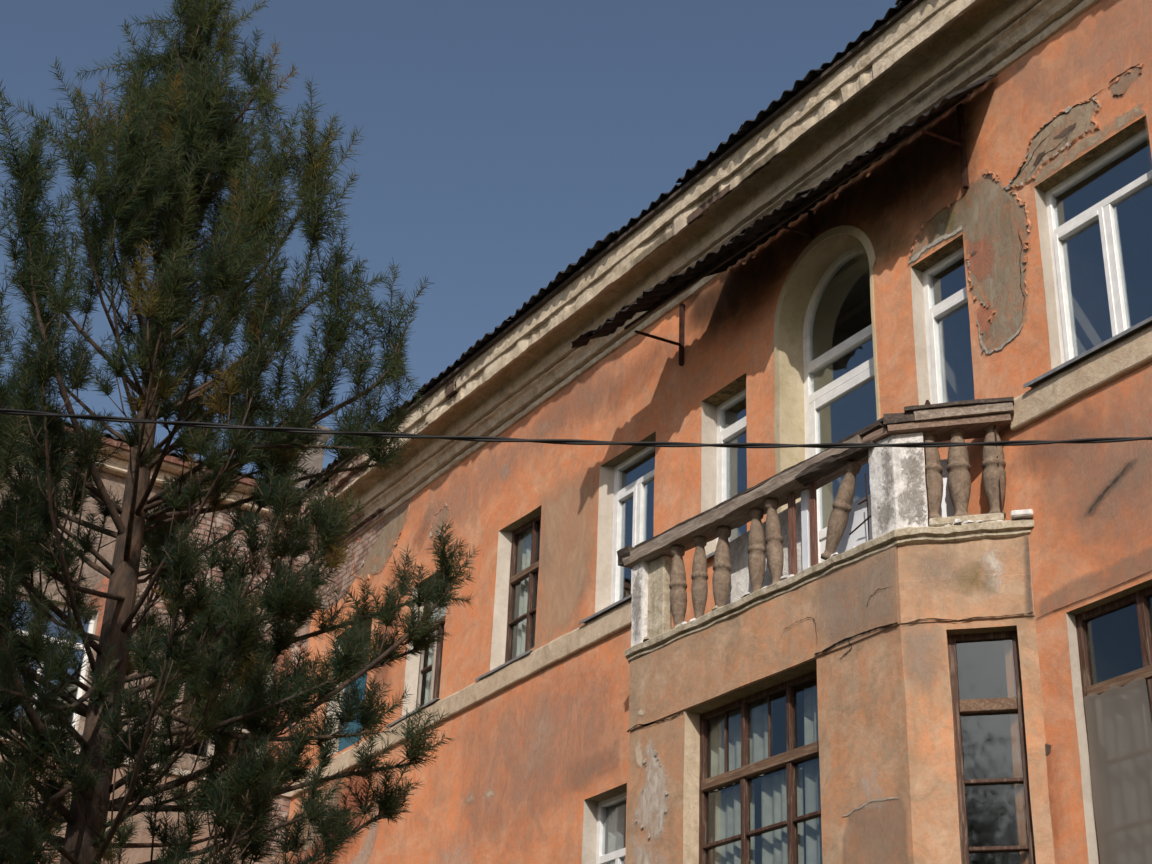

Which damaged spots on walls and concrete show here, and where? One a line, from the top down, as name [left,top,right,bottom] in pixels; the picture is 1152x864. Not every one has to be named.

peeling [908,63,1144,354]
crack [785,586,1033,659]
peeling [635,740,668,864]